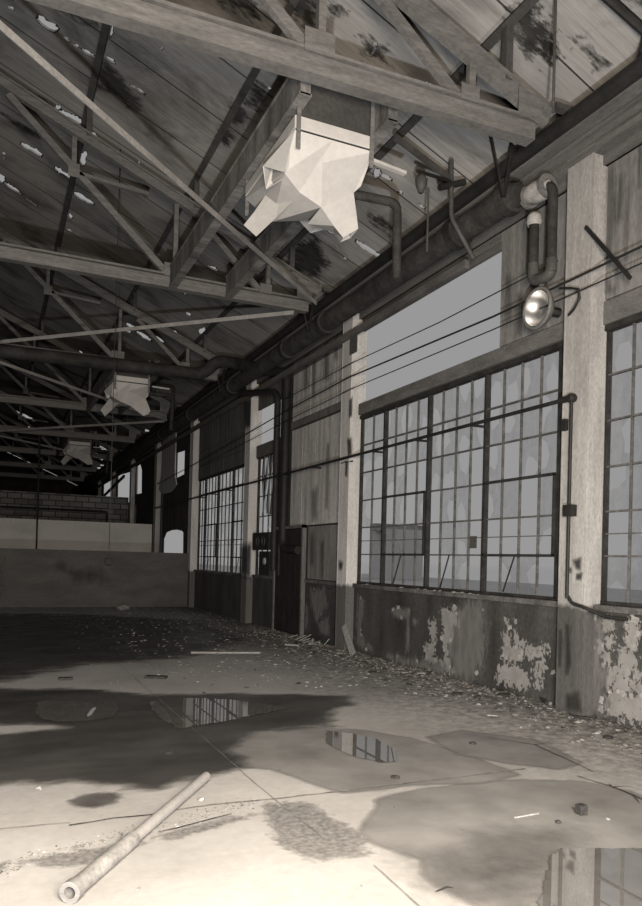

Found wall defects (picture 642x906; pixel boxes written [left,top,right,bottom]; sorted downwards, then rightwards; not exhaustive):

damp [505,5,557,64]
peeling [386,588,556,694]
peeling [593,614,642,728]